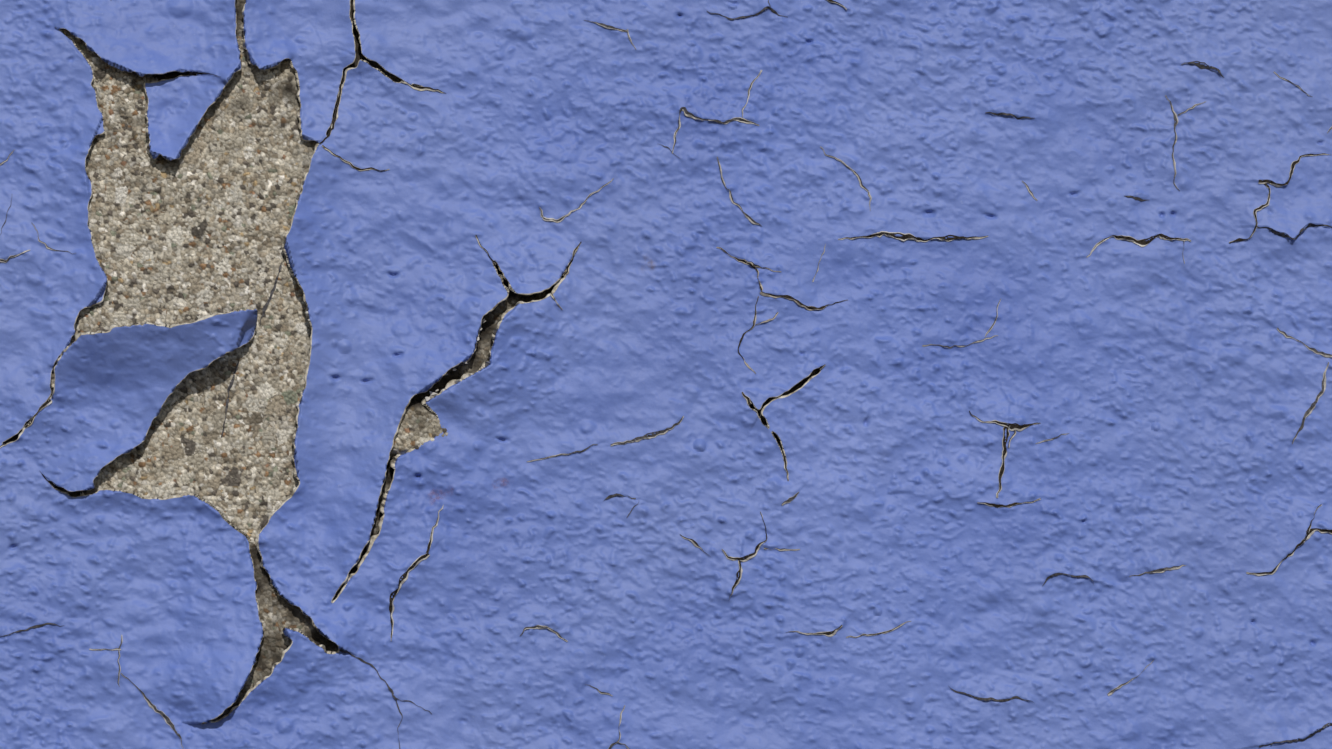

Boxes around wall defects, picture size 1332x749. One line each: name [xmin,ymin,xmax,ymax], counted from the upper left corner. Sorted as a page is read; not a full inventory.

crack [319,0,444,171]
crack [1229,127,1332,243]
crack [1087,234,1191,263]
crack [0,370,55,448]
crack [41,473,99,498]
peeling [20,0,356,726]
crack [331,178,614,603]
crack [680,146,988,599]
crack [969,411,1069,508]
crack [1246,504,1332,576]
crack [1277,328,1332,444]
crack [339,505,444,749]